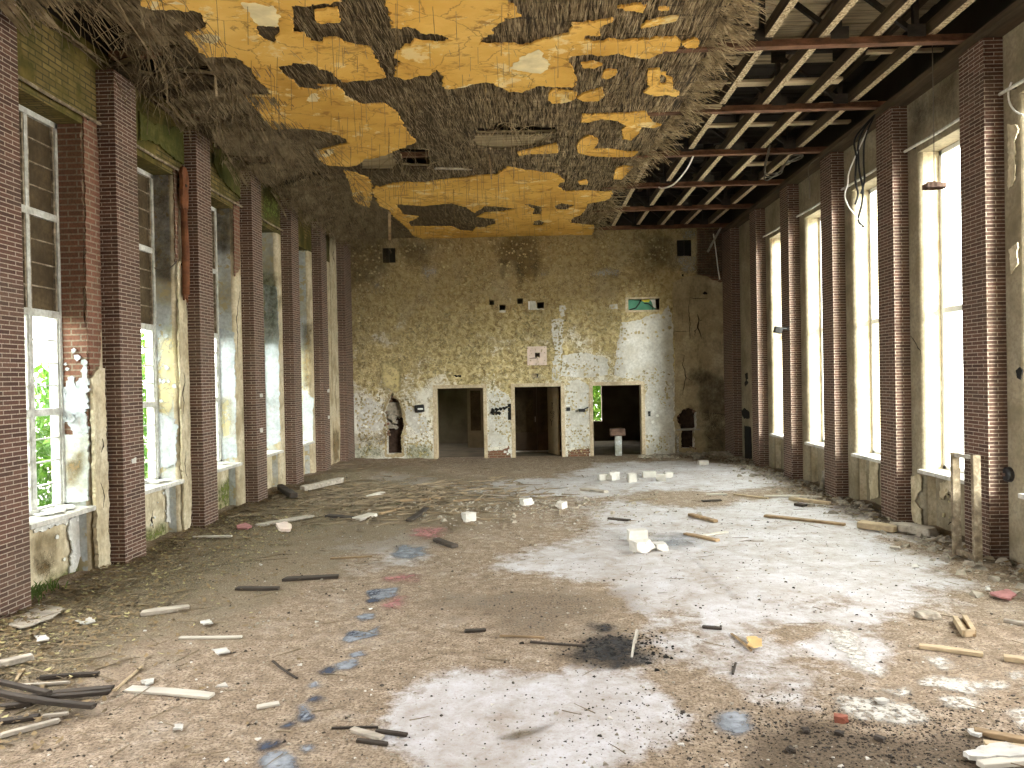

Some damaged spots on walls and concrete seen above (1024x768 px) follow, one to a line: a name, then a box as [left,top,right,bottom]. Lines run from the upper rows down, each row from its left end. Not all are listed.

spalling [241,2,281,41]
spalling [510,49,550,74]
water stain [153,175,171,279]
water stain [216,208,231,250]
peeling [212,143,241,276]
flaking render [32,116,102,574]
peeling [352,203,725,458]
crack [676,298,707,395]